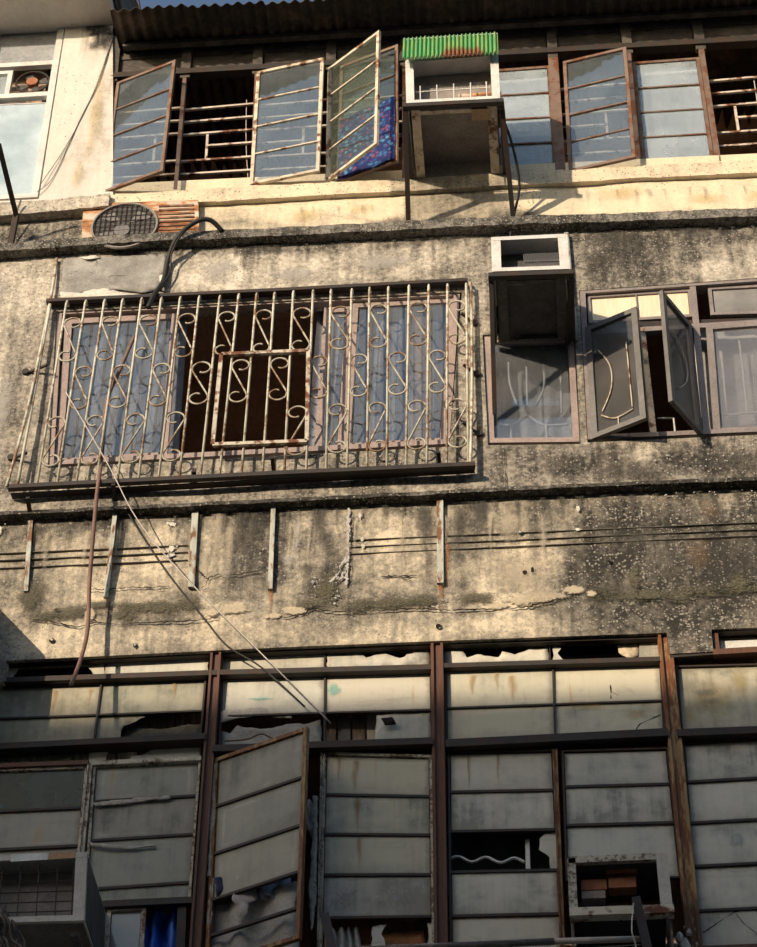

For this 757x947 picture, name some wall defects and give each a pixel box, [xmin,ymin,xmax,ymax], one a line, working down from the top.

damp [445,499,496,556]
damp [17,582,202,622]
peeling [205,601,250,616]
peeling [263,606,306,619]
damp [285,556,438,614]
damp [454,592,495,604]
peeling [486,585,597,609]
damp [589,567,757,604]